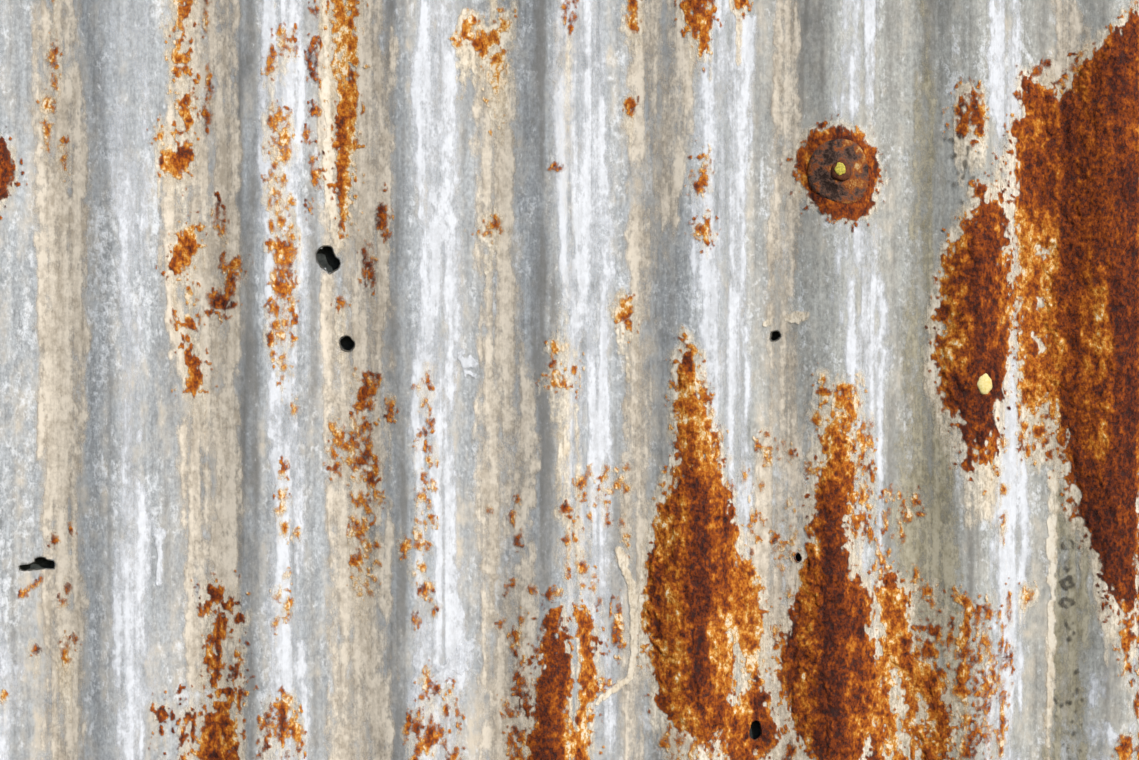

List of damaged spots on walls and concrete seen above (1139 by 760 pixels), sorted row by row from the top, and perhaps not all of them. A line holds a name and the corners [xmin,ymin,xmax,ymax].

rust [0,136,24,219]
rust [147,0,228,419]
rust [261,0,394,415]
rust [449,0,517,142]
rust [674,0,753,80]
rust [781,114,888,232]
rust [150,567,307,760]
rust [323,296,399,613]
rust [400,367,439,630]
rust [403,665,465,760]
rust [495,327,1040,760]
rust [925,0,1139,760]